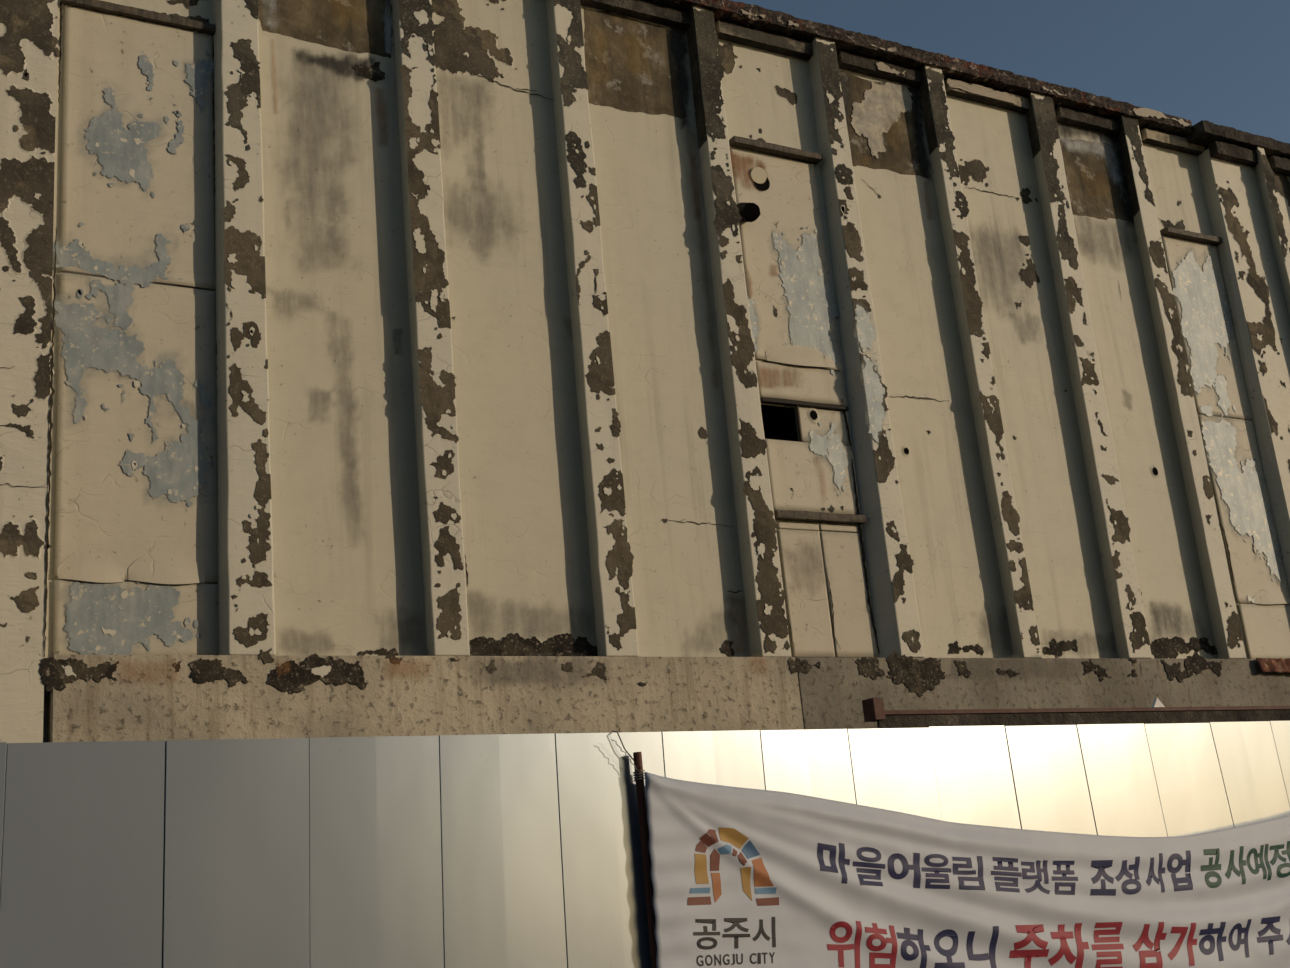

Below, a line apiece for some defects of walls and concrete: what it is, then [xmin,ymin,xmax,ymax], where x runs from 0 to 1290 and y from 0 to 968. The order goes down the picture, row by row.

peeling [0,0,214,507]
peeling [222,39,275,664]
peeling [398,0,517,479]
leakage [584,8,687,119]
peeling [694,8,761,263]
peeling [723,278,759,388]
peeling [772,41,911,484]
leakage [1059,139,1130,221]
peeling [0,515,52,613]
peeling [64,581,202,655]
peeling [433,496,464,640]
rust [1256,658,1290,673]